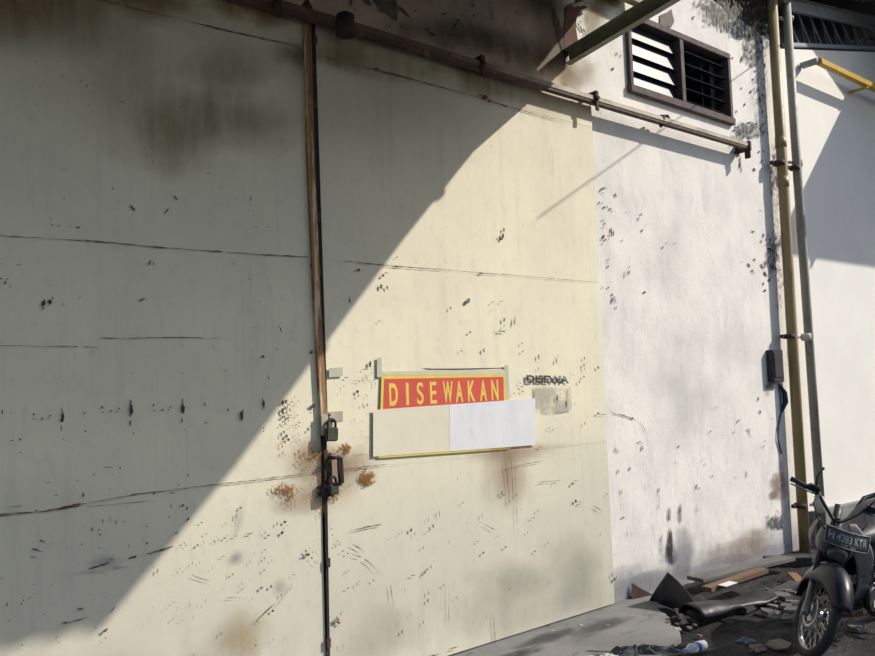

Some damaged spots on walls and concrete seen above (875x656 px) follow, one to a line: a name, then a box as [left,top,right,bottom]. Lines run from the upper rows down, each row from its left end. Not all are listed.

peeling [349,0,416,28]
damp [694,0,770,140]
damp [764,147,783,307]
rust [293,442,351,471]
rust [359,471,377,486]
rust [270,483,297,507]